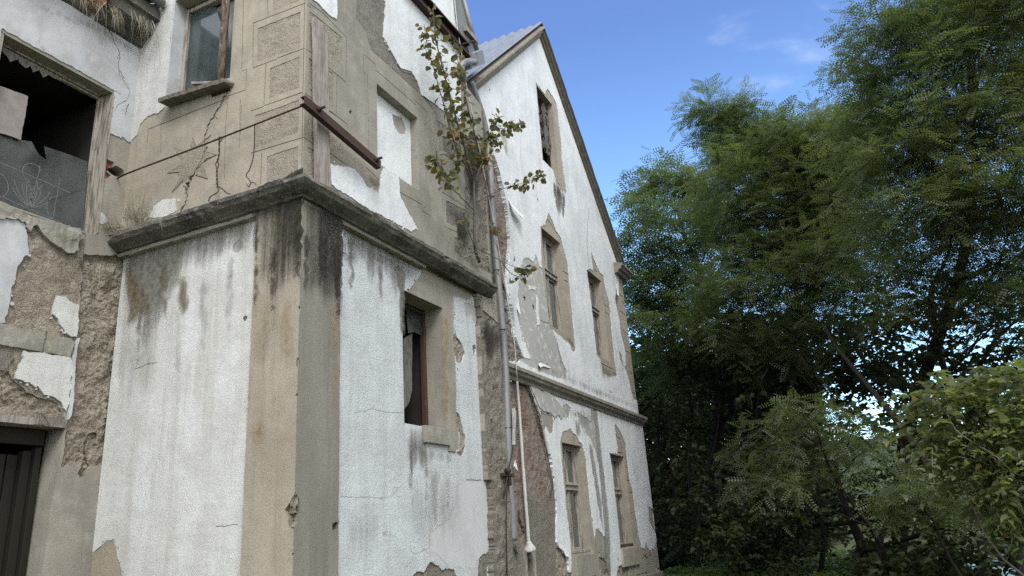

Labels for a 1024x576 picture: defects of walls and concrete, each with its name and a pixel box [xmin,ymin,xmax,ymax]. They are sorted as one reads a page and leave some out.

flaking render [0,201,86,431]
spalling [78,433,95,477]
peeling [91,539,124,576]
leakage [126,224,257,341]
leakage [296,218,411,331]
peeling [404,267,477,456]
peeling [457,138,576,380]
flaking render [510,381,660,576]